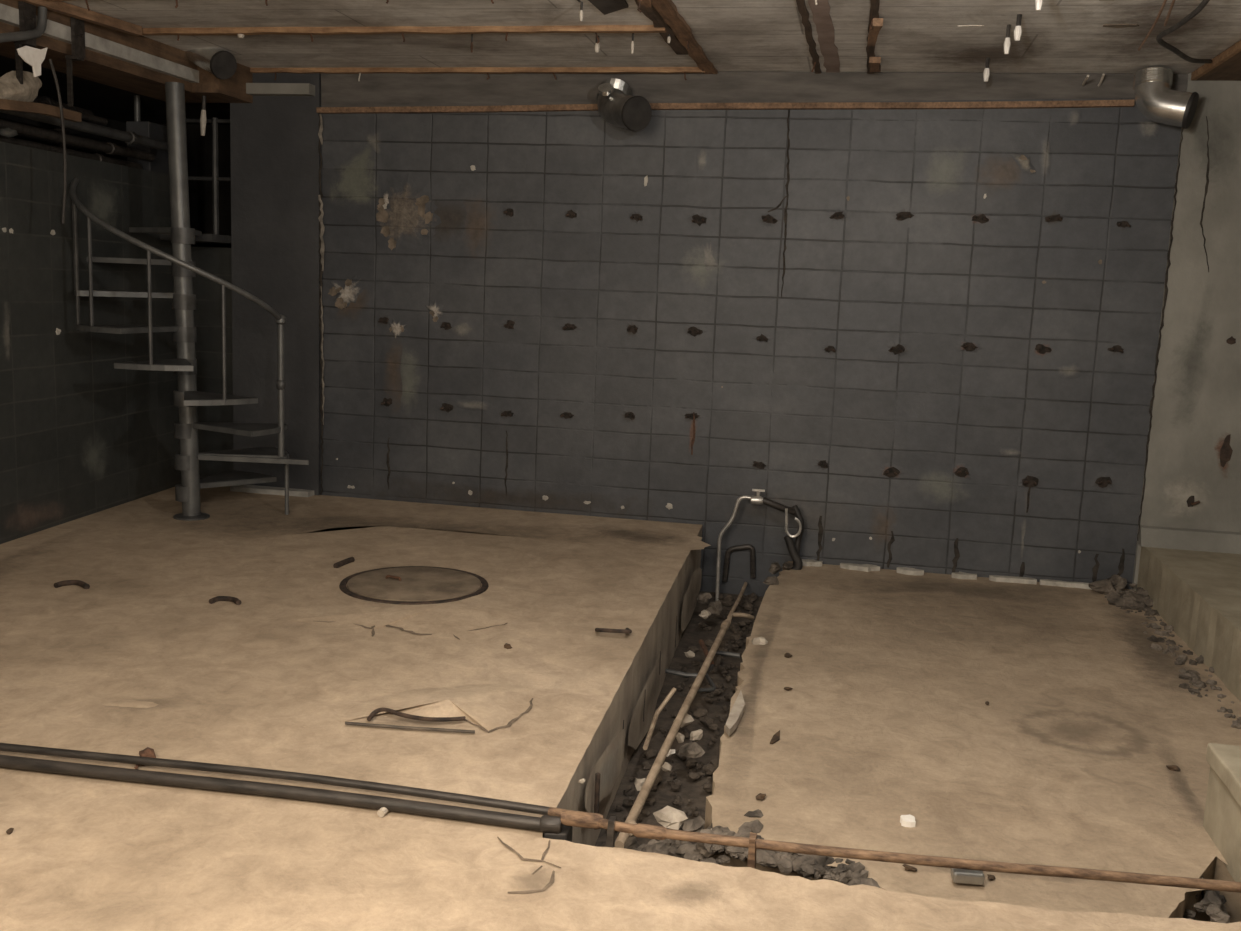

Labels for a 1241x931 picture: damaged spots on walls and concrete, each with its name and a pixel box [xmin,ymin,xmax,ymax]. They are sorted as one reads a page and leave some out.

peeling [328,275,364,310]
spalling [371,172,441,253]
crack [768,102,790,298]
crack [1092,116,1209,582]
spalling [704,561,1241,923]
leakage [1006,706,1228,865]